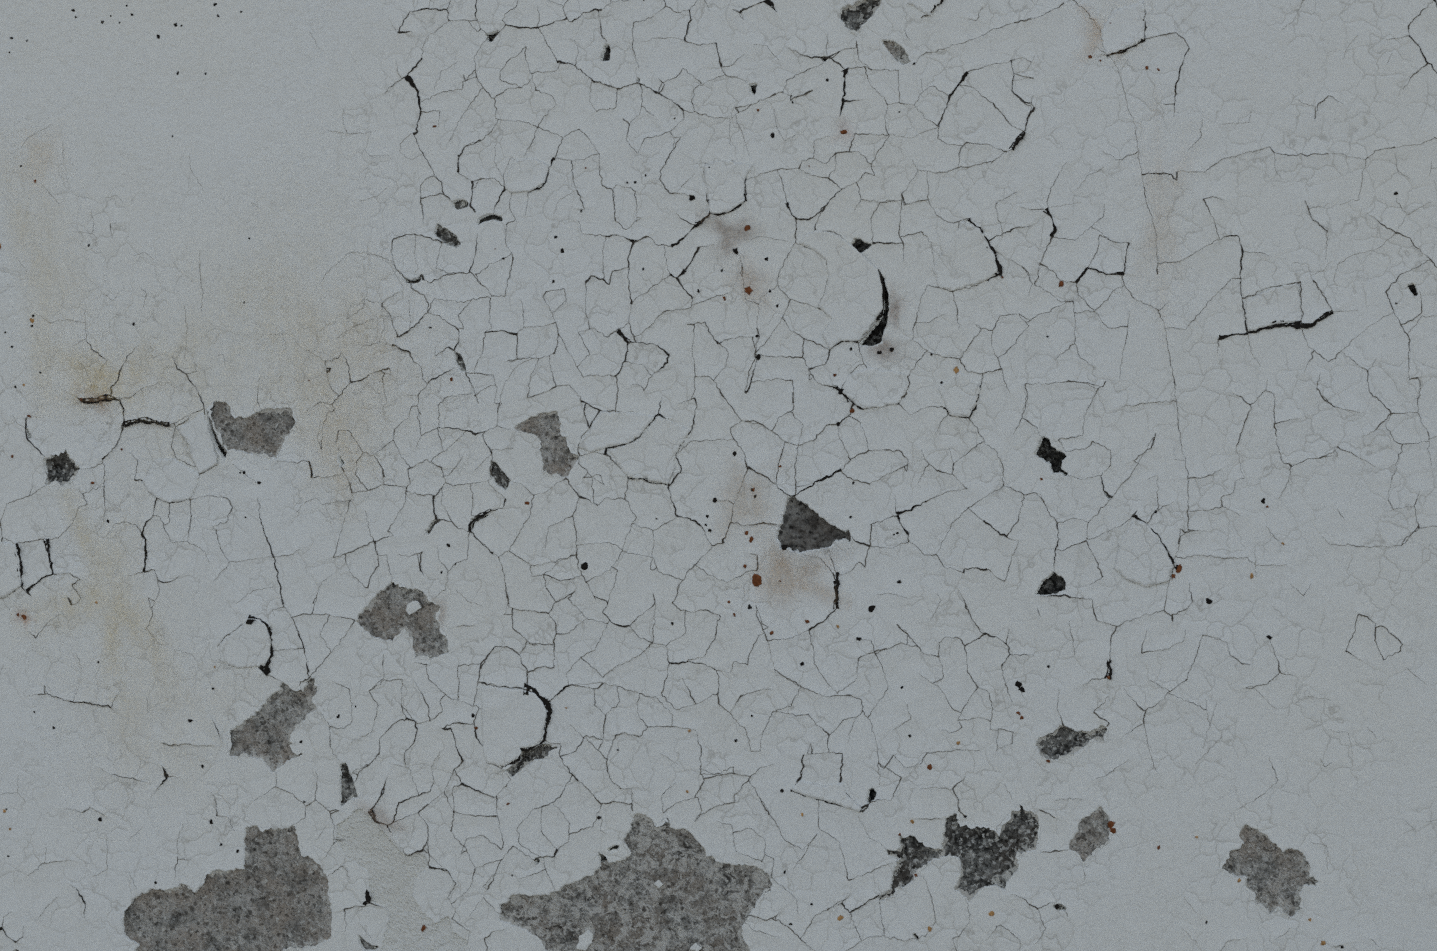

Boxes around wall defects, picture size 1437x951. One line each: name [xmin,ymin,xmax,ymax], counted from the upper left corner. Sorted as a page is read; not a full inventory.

crack [0,304,355,689]
peeling [778,497,852,552]
crack [294,0,1437,951]
crack [34,657,148,712]
crack [101,720,221,789]
peeling [227,676,320,772]
crack [0,807,141,943]
peeling [120,825,332,951]
crack [262,774,386,938]
peeling [500,814,786,951]
peeling [880,803,1040,901]
peeling [1219,825,1318,918]